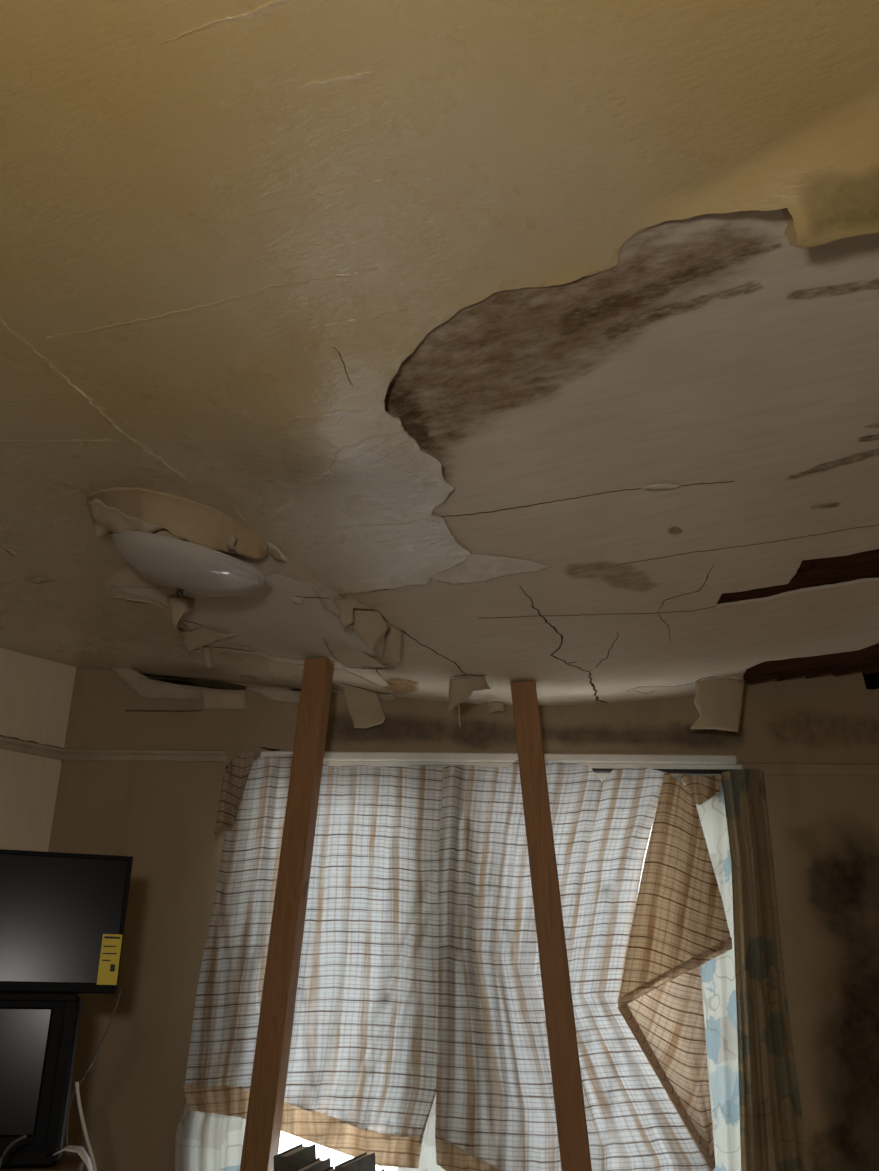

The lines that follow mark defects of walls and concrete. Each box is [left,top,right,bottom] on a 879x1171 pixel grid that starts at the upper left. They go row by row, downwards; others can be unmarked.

peeling [0,0,862,709]
leakage [385,238,758,451]
crack [442,488,641,517]
crack [483,525,877,703]